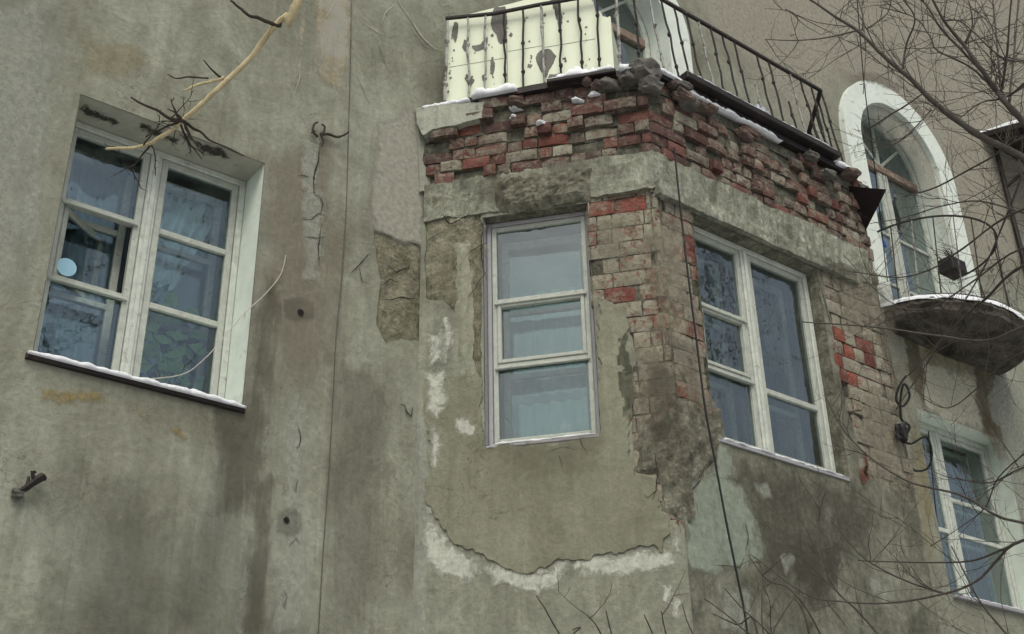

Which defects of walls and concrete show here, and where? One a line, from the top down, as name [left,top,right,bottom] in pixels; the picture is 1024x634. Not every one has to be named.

peeling [543,0,569,28]
crack [300,148,327,263]
flaking render [374,216,487,467]
flaking render [415,6,921,617]